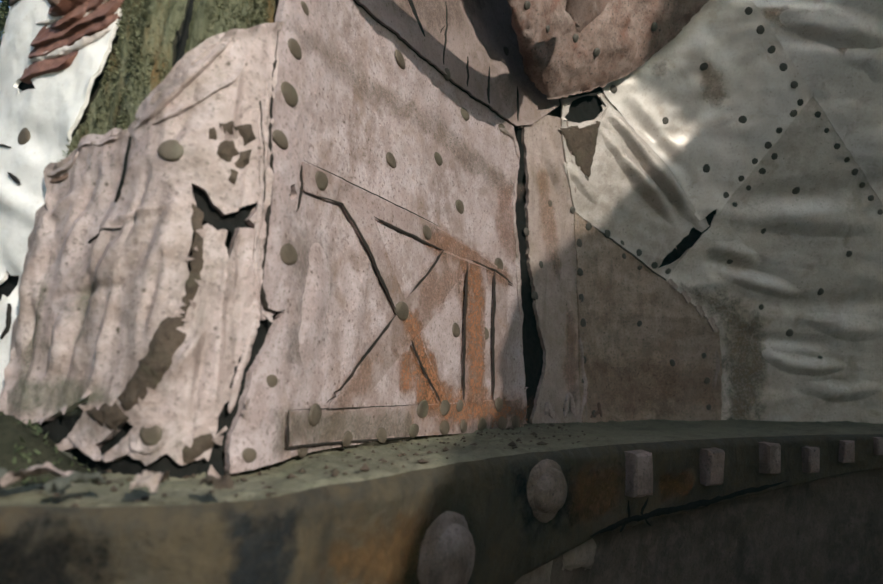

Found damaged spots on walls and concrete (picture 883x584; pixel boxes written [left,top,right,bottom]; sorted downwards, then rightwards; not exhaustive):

peeling [15,0,125,96]
peeling [45,128,122,183]
peeling [134,32,246,128]
crack [408,0,448,65]
crack [466,56,490,106]
crack [514,86,522,121]
spalling [559,95,609,178]
peeling [208,78,273,413]
spalling [31,203,228,479]
corrosion [400,231,532,429]